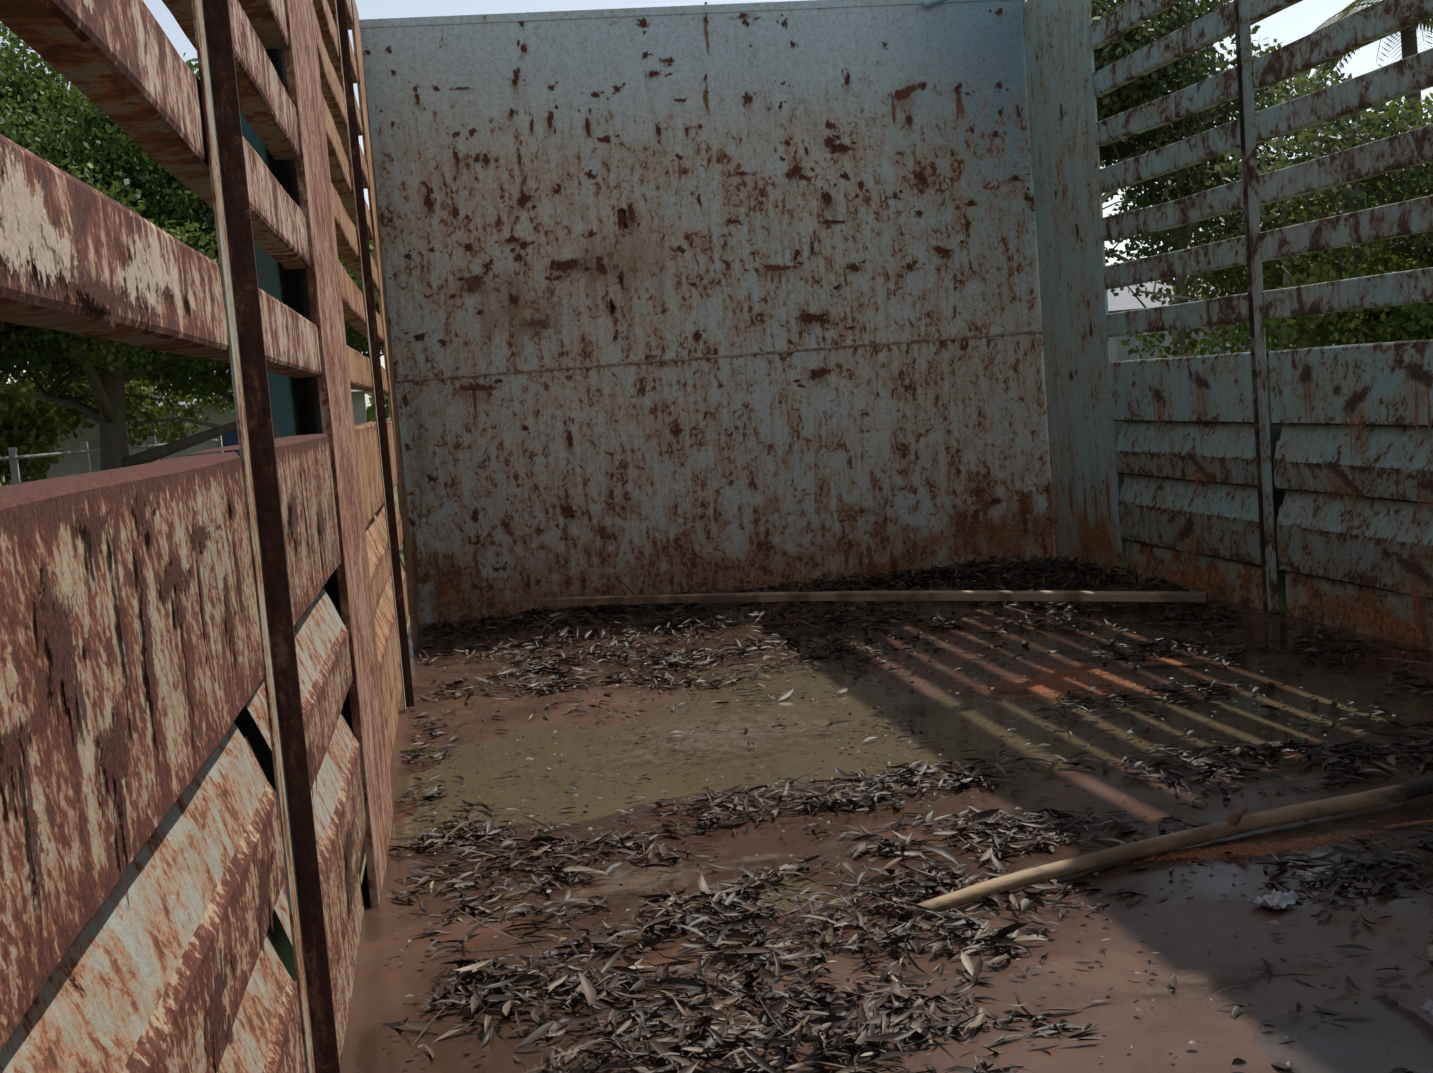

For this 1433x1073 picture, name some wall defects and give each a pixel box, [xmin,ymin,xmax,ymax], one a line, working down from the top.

rust [887,80,927,123]
rust [954,83,965,124]
rust [58,259,161,331]
rust [758,261,804,285]
rust [1314,383,1373,524]
rust [1395,354,1433,445]
rust [279,458,327,593]
rust [27,487,245,912]
rust [0,682,48,923]
rust [253,846,275,961]
rust [345,820,357,920]
rust [201,944,237,1073]